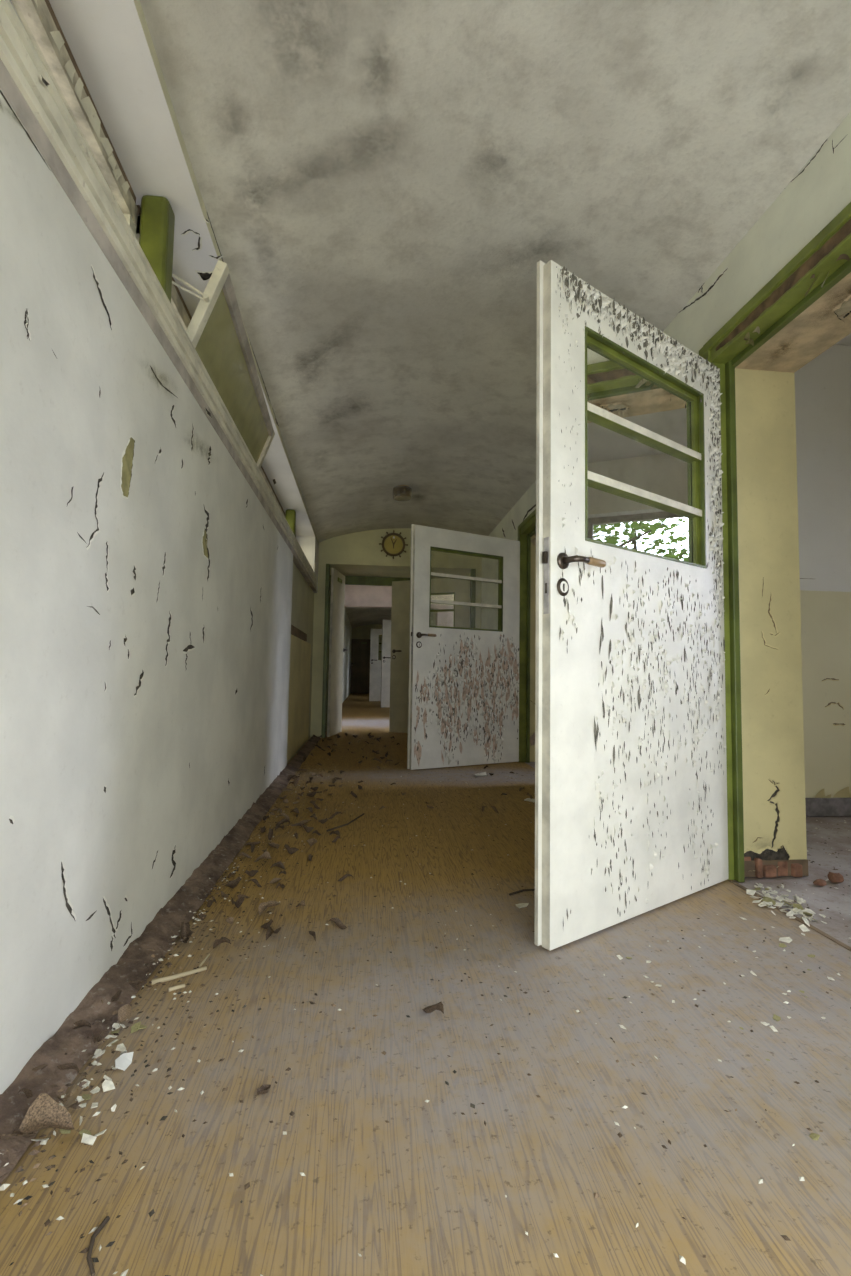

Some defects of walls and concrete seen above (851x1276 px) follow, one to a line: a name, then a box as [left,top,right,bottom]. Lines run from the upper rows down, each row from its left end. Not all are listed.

crack [0,89,51,171]
crack [792,135,847,181]
crack [181,213,223,261]
crack [91,264,112,330]
crack [680,267,728,312]
crack [24,308,57,358]
crack [67,366,211,698]
peeling [556,266,726,915]
peeling [414,634,535,766]
crack [753,778,781,848]
crack [152,845,176,879]
crack [61,860,132,951]